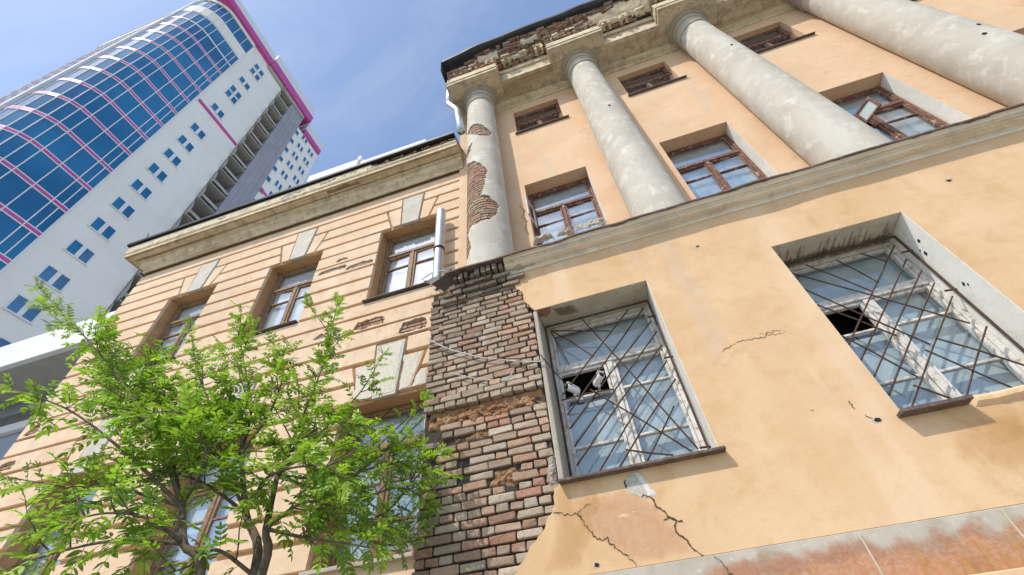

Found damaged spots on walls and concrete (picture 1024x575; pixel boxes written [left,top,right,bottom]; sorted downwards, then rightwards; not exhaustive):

flaking render [587,0,651,27]
flaking render [478,34,547,63]
flaking render [317,124,499,259]
flaking render [321,258,373,275]
crack [723,330,786,351]
flaking render [352,286,575,575]
crack [553,503,637,566]
crack [624,480,733,575]